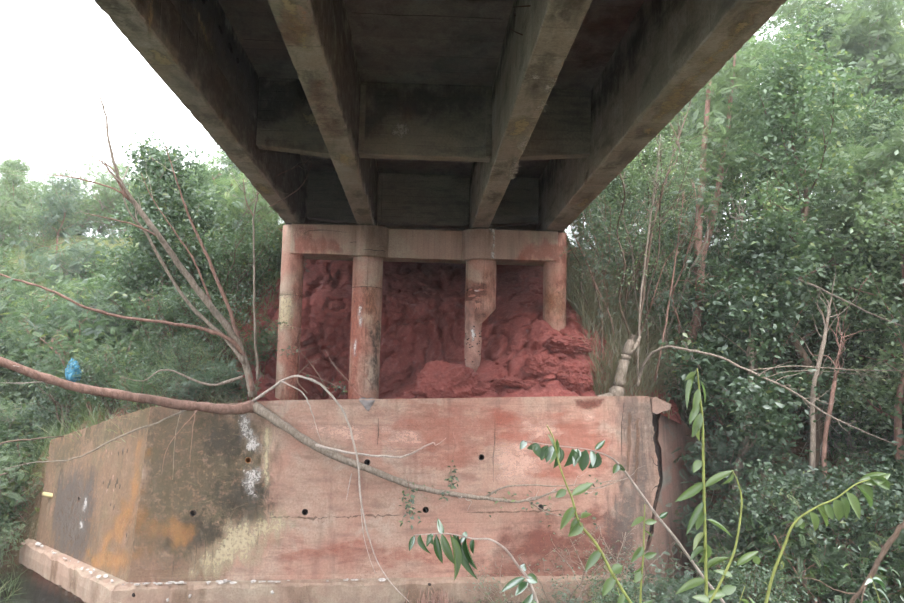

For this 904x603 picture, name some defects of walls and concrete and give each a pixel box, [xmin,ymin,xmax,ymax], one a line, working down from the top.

water stain [53,410,285,574]
crack [269,513,399,521]
crack [467,507,562,515]
crack [647,415,661,542]